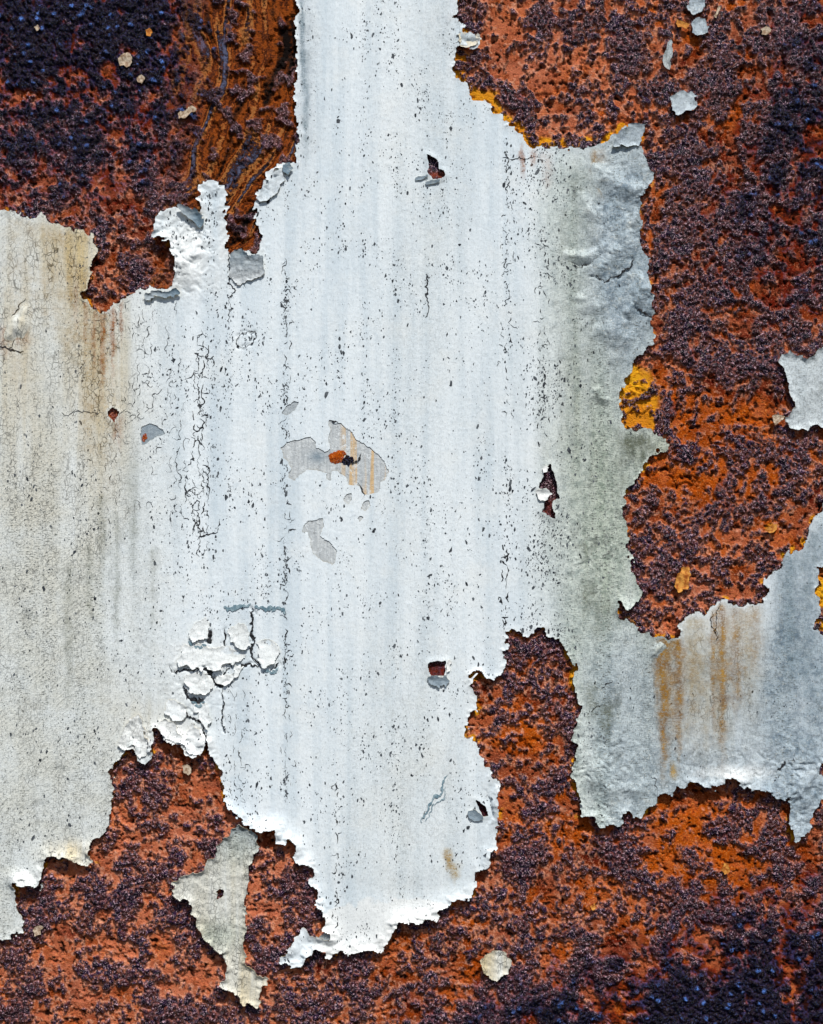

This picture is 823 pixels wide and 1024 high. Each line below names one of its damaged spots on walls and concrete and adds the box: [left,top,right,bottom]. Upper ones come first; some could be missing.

peeling [0,0,300,314]
peeling [415,154,445,185]
peeling [452,0,823,640]
crack [67,298,221,556]
peeling [140,423,165,445]
peeling [282,401,299,415]
peeling [281,420,389,522]
peeling [302,518,337,565]
rust [659,638,682,777]
rust [711,606,738,726]
peeling [0,627,823,1024]